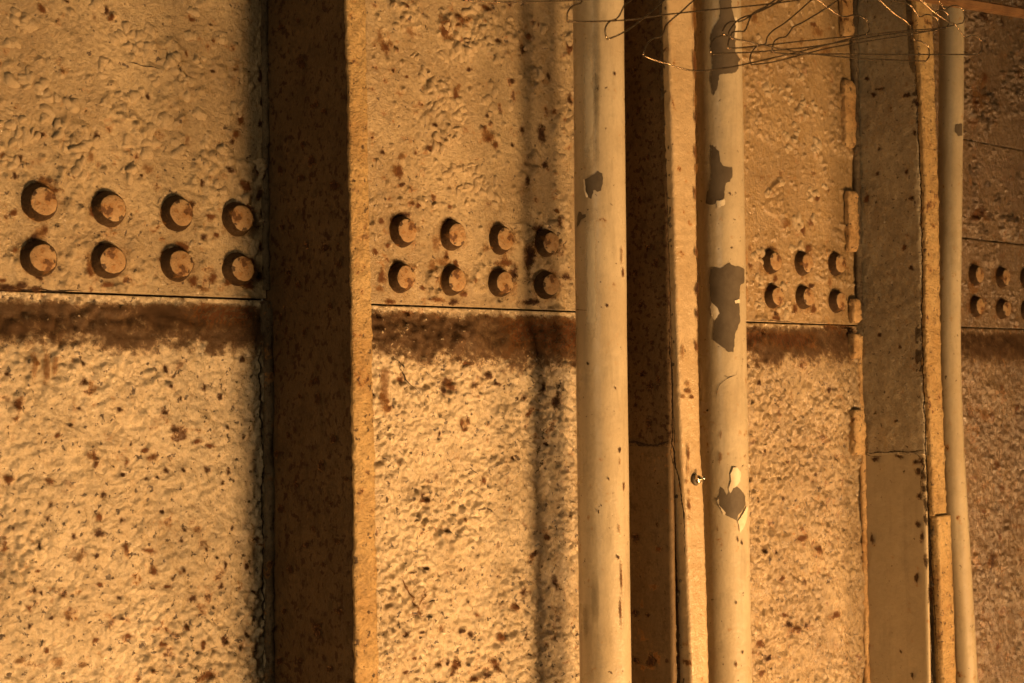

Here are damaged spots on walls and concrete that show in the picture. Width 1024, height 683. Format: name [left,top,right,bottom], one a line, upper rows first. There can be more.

peeling [710,0,741,95]
rust [32,177,63,194]
rust [226,165,266,216]
peeling [583,171,603,199]
peeling [706,146,733,209]
rust [12,221,48,252]
rust [86,243,114,288]
rust [429,205,459,284]
rust [497,208,564,291]
peeling [709,263,745,352]
crack [258,342,266,675]
peeling [717,468,748,533]